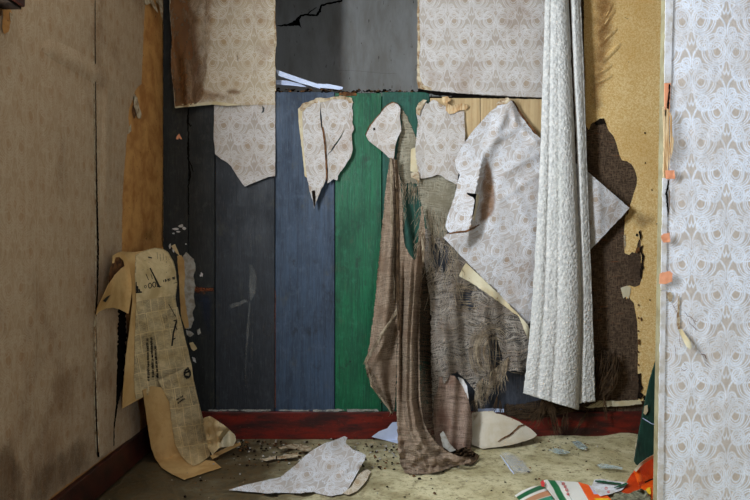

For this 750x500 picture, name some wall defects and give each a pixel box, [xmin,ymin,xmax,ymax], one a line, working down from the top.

peeling [144,0,163,20]
crack [277,0,342,27]
leakage [170,0,210,107]
peeling [442,96,468,114]
peeling [169,244,203,363]